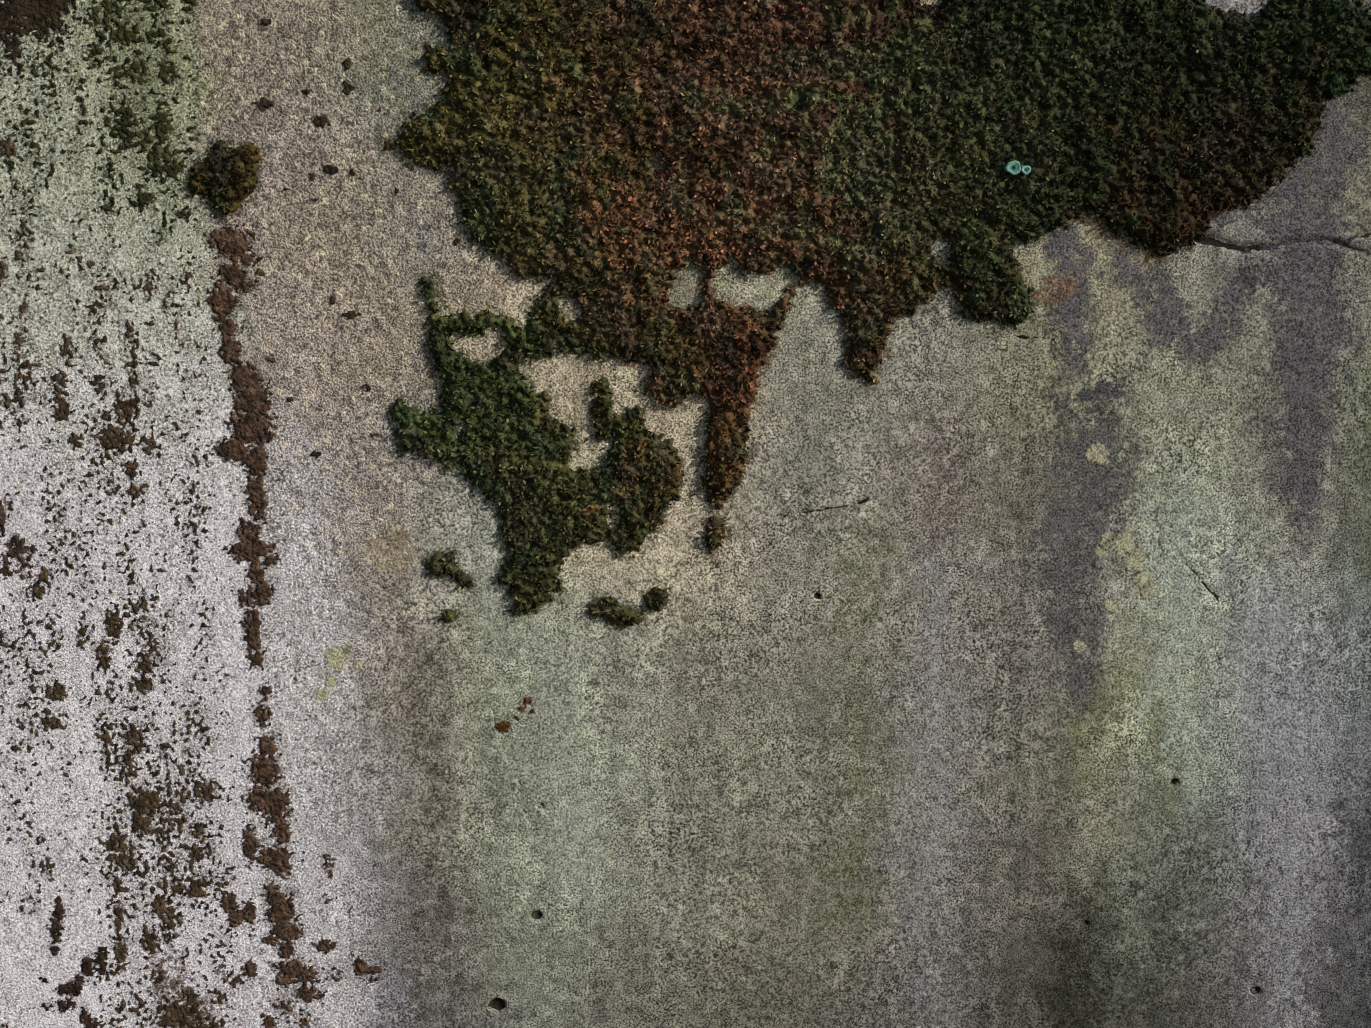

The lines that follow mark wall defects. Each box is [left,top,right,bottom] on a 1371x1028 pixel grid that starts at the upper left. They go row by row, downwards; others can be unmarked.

leakage [0,0,377,1028]
leakage [1015,82,1371,1028]
crack [1196,233,1371,253]